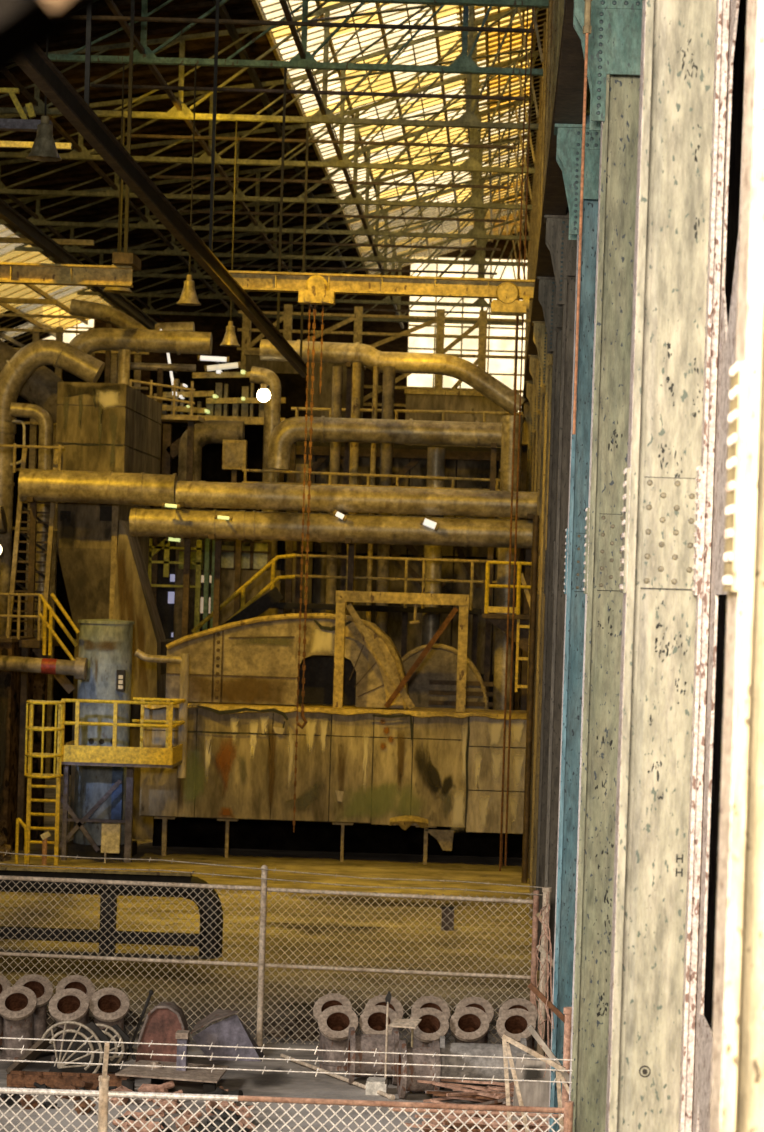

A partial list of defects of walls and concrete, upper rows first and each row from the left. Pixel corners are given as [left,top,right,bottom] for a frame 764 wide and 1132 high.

leakage [178,740,211,804]
leakage [232,718,293,804]
leakage [306,722,327,748]
leakage [345,721,524,825]